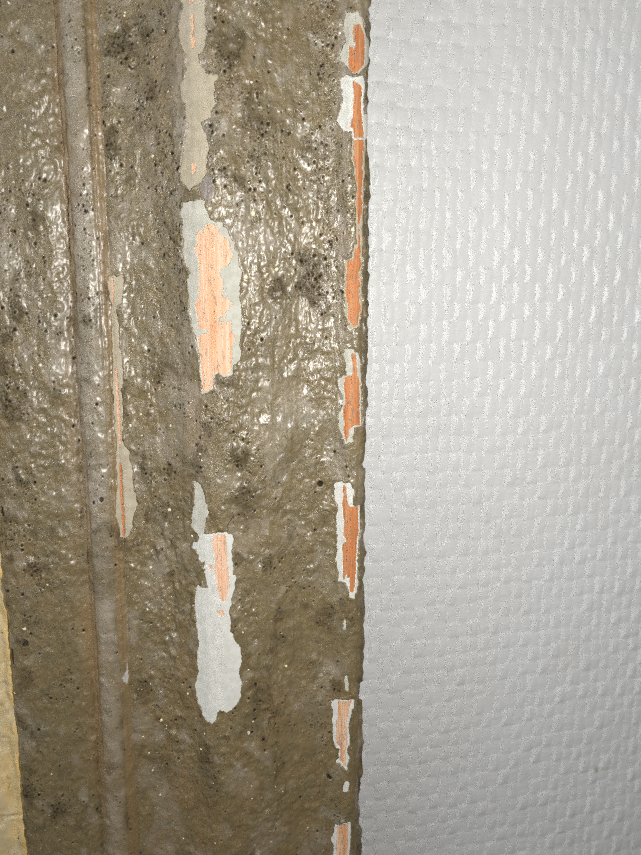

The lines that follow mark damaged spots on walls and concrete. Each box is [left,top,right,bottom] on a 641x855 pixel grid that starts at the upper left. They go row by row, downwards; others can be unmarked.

peeling [179,0,243,394]
peeling [337,12,369,330]
peeling [107,275,138,538]
peeling [338,348,361,444]
peeling [191,481,242,724]
peeling [334,481,360,598]
peeling [331,821,351,855]
peeling [331,699,354,770]